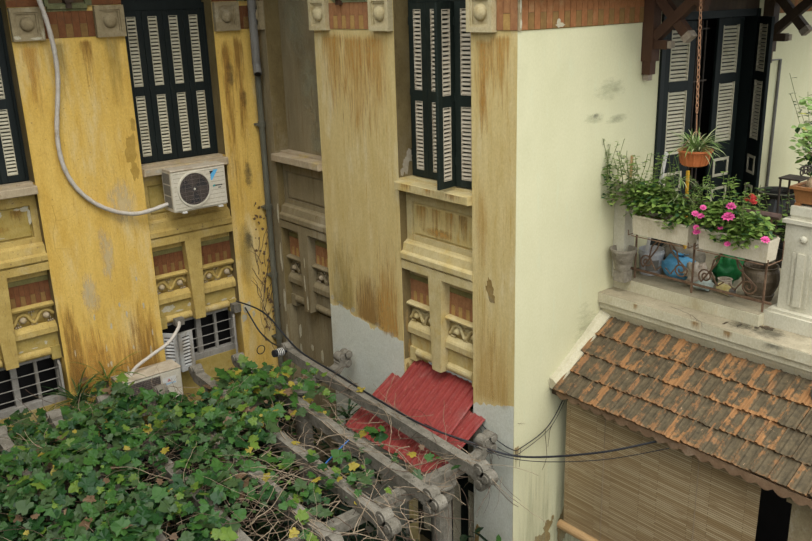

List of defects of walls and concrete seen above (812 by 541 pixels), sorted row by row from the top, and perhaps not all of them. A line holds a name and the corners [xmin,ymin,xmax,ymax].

damp [223,40,245,138]
peeling [400,148,412,176]
peeling [534,506,566,541]